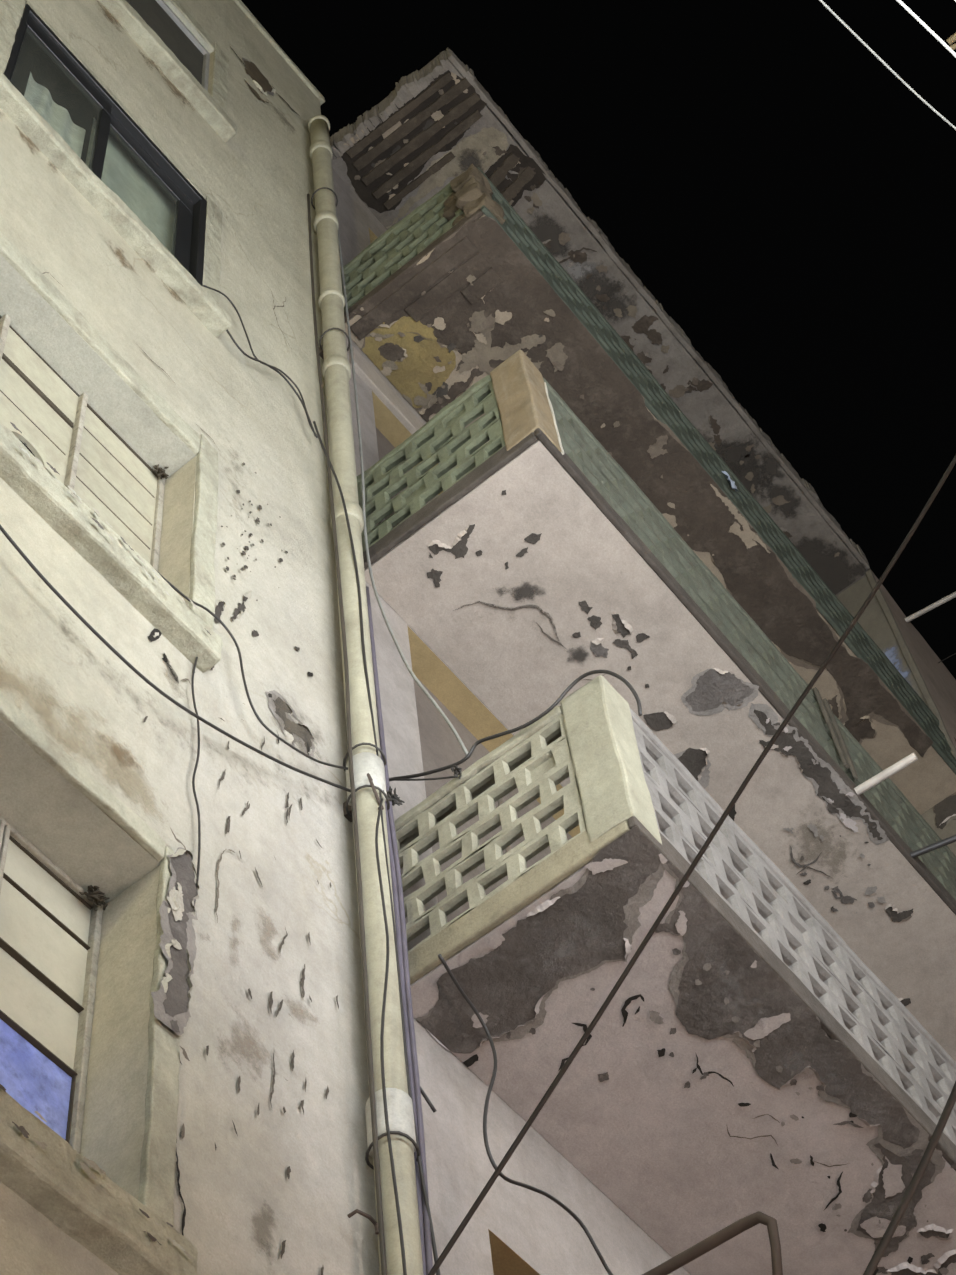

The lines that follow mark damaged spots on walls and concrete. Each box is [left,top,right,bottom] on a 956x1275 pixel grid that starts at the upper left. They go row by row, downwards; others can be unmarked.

spalling [230,46,296,113]
water stain [482,146,713,398]
peeling [330,47,933,757]
water stain [705,415,866,595]
spalling [202,591,252,635]
crack [461,601,566,649]
spalling [151,829,199,1065]
crack [558,1023,592,1071]
crack [657,1048,665,1057]
peeling [415,824,956,1275]
crack [692,1054,780,1169]
crack [810,1155,849,1210]